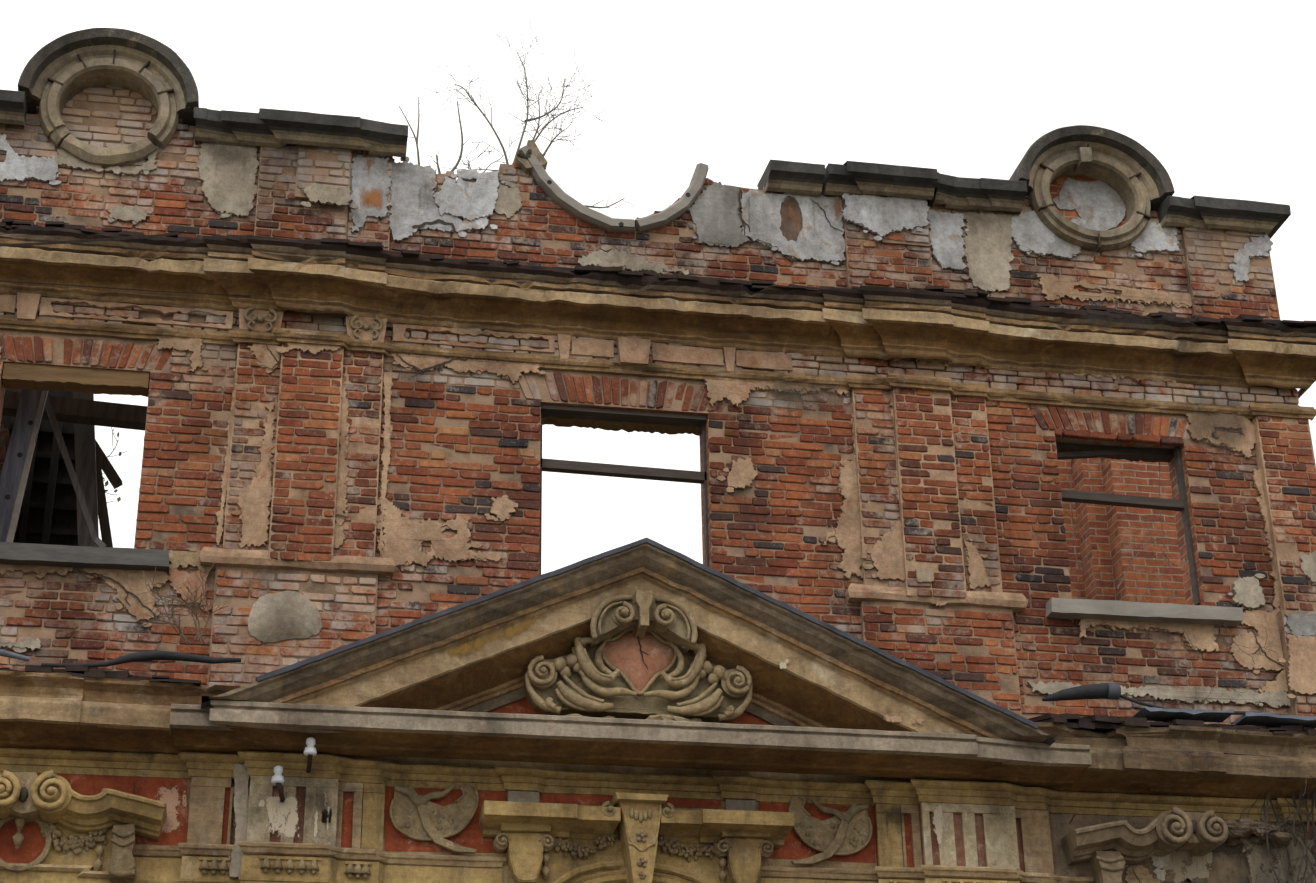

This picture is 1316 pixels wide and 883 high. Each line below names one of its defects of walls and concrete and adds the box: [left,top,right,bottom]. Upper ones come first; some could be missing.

flaking render [0,134,157,186]
flaking render [196,141,259,219]
flaking render [299,155,522,242]
flaking render [578,244,689,275]
flaking render [688,181,1192,308]
flaking render [1229,234,1273,282]
flaking render [376,353,546,579]
flaking render [704,378,934,583]
flaking render [1079,401,1316,709]
crack [637,636,648,669]
flaking render [1027,680,1086,696]
peeling [1124,822,1316,883]